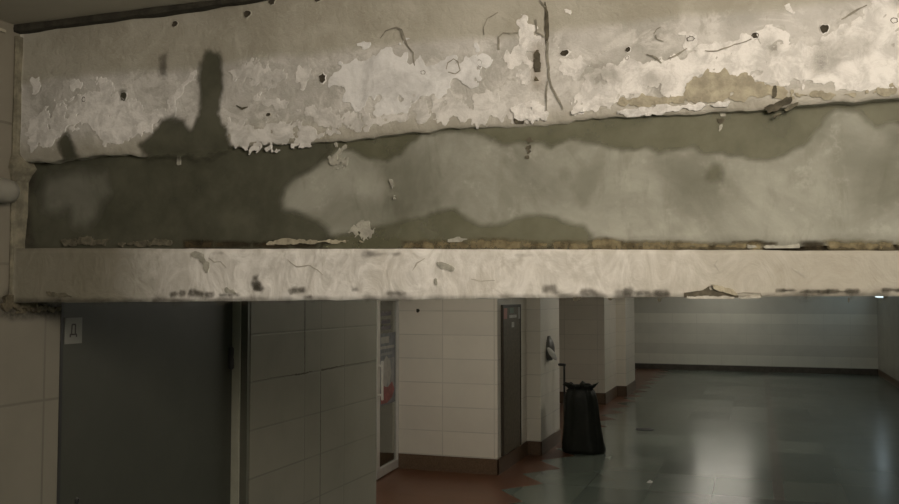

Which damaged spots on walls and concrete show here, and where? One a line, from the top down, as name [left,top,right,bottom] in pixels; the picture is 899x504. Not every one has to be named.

peeling [25,70,197,153]
water stain [25,51,590,249]
peeling [225,14,549,155]
crack [483,0,563,111]
water stain [438,101,899,159]
peeling [558,0,899,132]
spalling [0,291,72,318]
spalling [434,262,455,285]